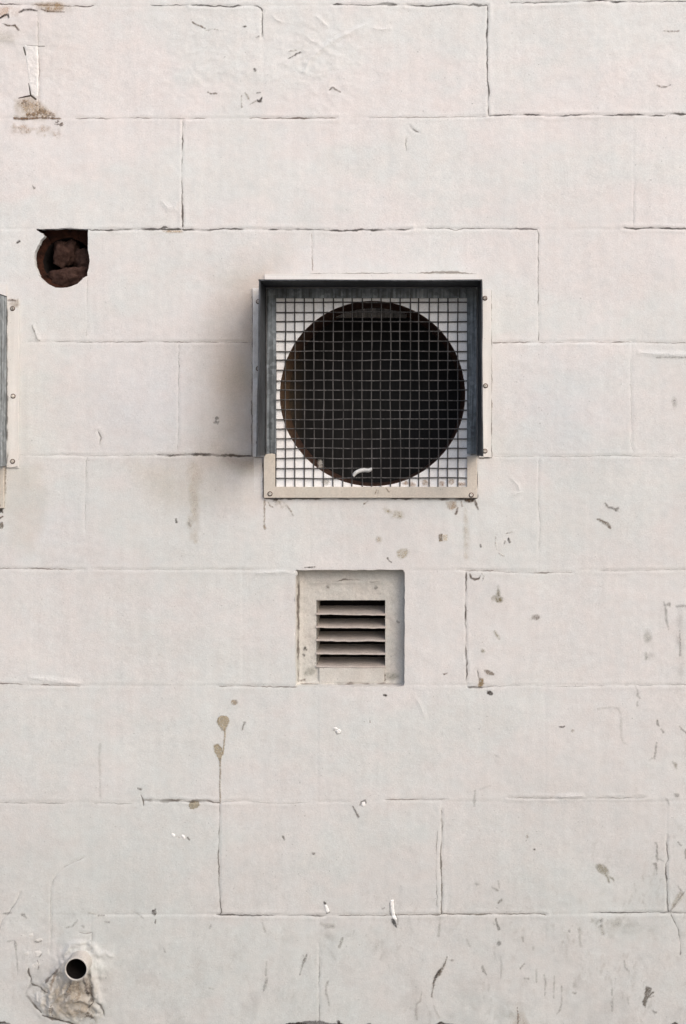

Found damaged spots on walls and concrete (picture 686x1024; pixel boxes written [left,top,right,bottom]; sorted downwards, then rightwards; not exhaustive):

peeling [14,45,63,131]
leakage [214,716,229,798]